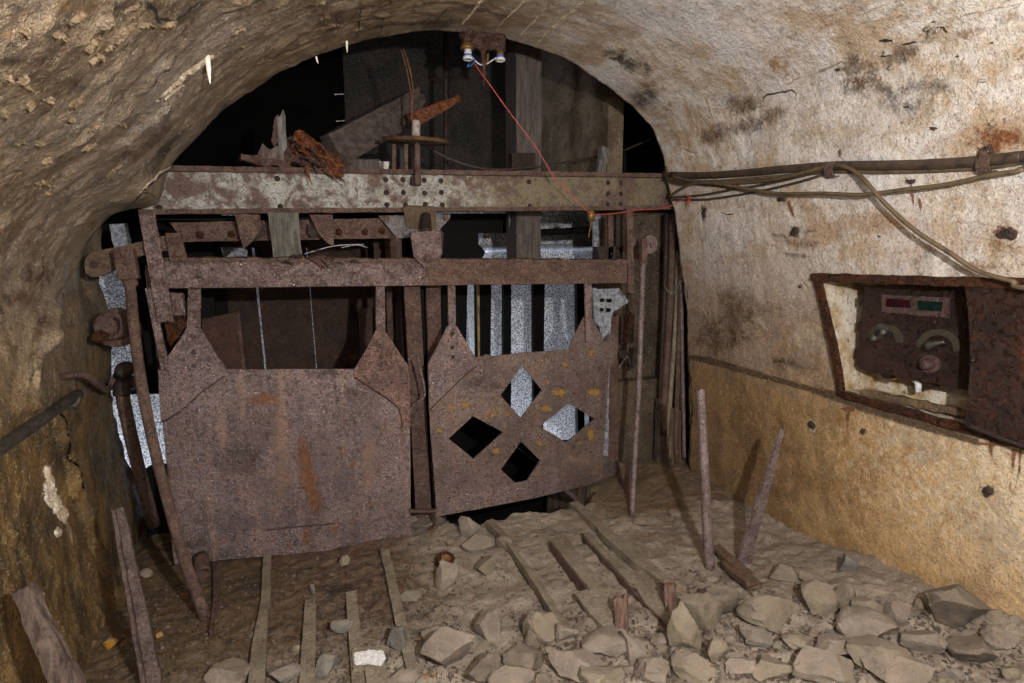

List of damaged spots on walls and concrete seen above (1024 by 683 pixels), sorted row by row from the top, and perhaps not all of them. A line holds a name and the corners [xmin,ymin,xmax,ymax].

leakage [888,48,916,64]
leakage [843,58,894,107]
rust [968,127,1024,153]
rust [977,442,1022,486]